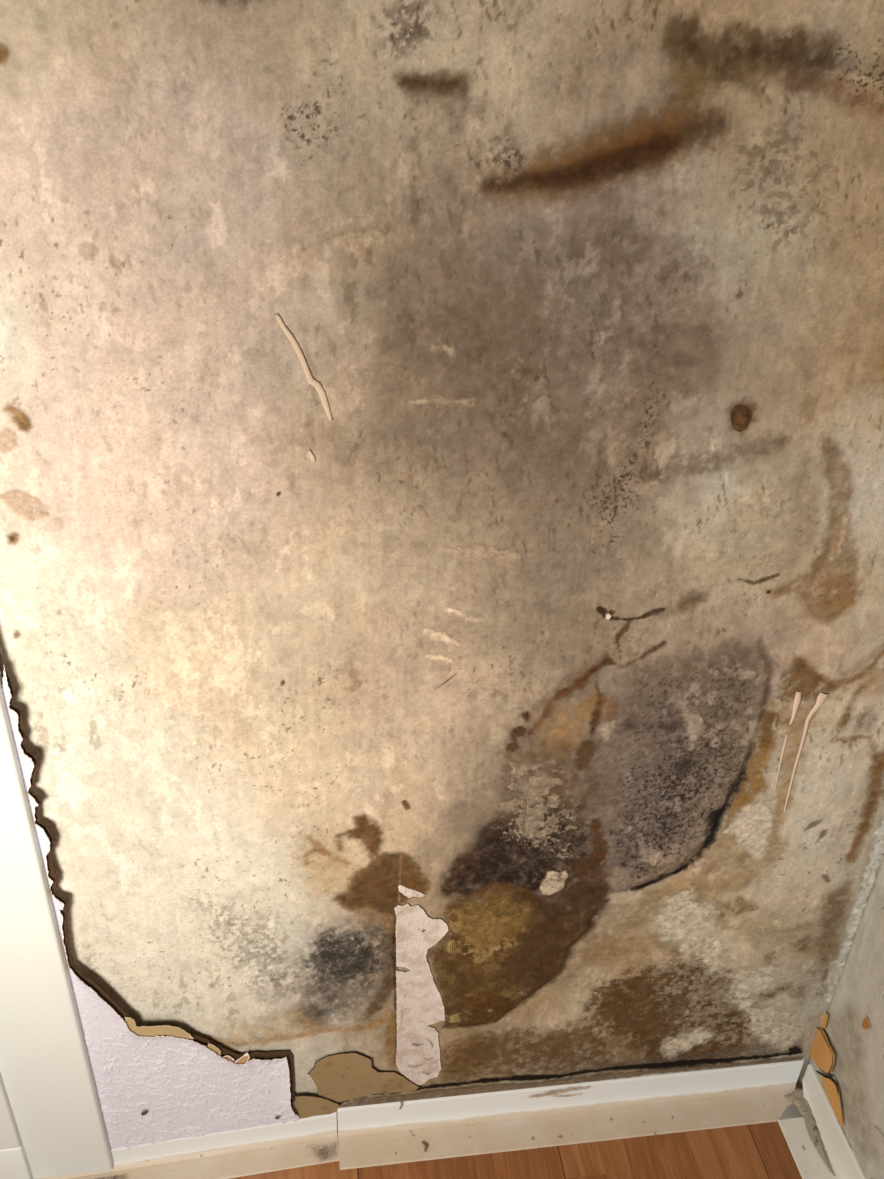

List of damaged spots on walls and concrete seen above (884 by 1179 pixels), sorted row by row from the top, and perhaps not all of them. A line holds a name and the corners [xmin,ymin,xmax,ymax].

rust [485,109,724,194]
damp [662,20,884,112]
crack [745,574,779,585]
damp [773,440,855,621]
damp [207,815,428,1067]
damp [434,645,884,1077]
flaking render [822,817,884,1018]
crack [340,1046,802,1104]